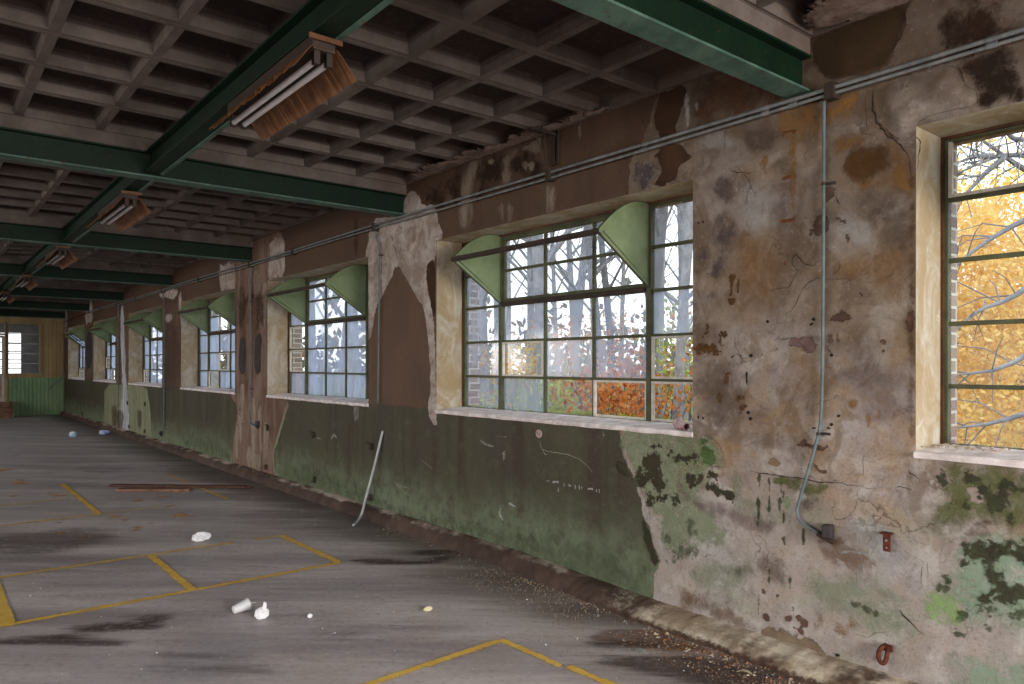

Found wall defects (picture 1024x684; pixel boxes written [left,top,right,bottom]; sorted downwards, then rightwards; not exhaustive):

crack [863,3,921,178]
water stain [938,0,1024,107]
spalling [239,333,262,374]
peeling [366,104,620,425]
peeling [616,0,1024,684]